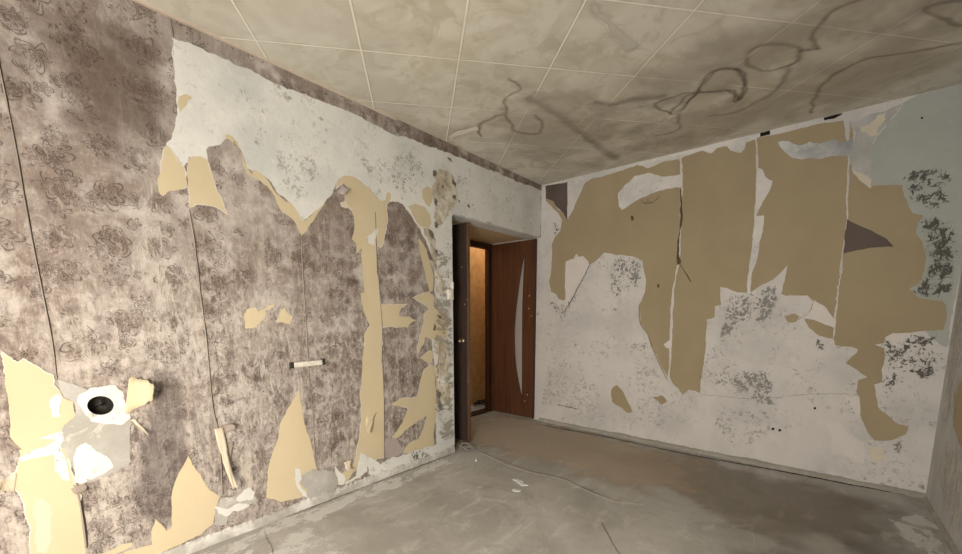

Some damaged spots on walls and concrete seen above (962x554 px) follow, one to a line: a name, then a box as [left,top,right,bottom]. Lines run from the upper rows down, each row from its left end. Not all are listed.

flaking render [166,37,542,485]
flaking render [618,173,682,221]
water stain [705,286,777,405]
flaking render [748,168,773,293]
flaking render [760,131,855,159]
water stain [881,166,962,422]
flaking render [32,499,53,553]
peeling [19,380,132,485]
flaking render [295,468,308,498]